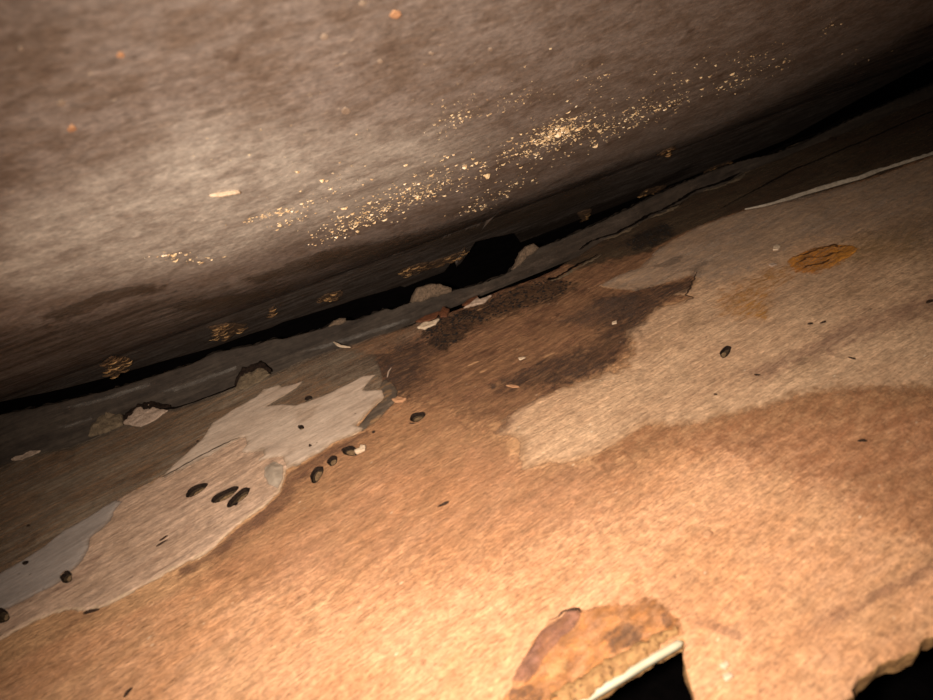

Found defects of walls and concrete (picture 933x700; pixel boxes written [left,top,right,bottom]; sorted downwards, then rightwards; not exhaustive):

water stain [0,24,933,573]
crack [547,99,933,281]
rust [788,244,857,273]
peeling [0,375,398,640]